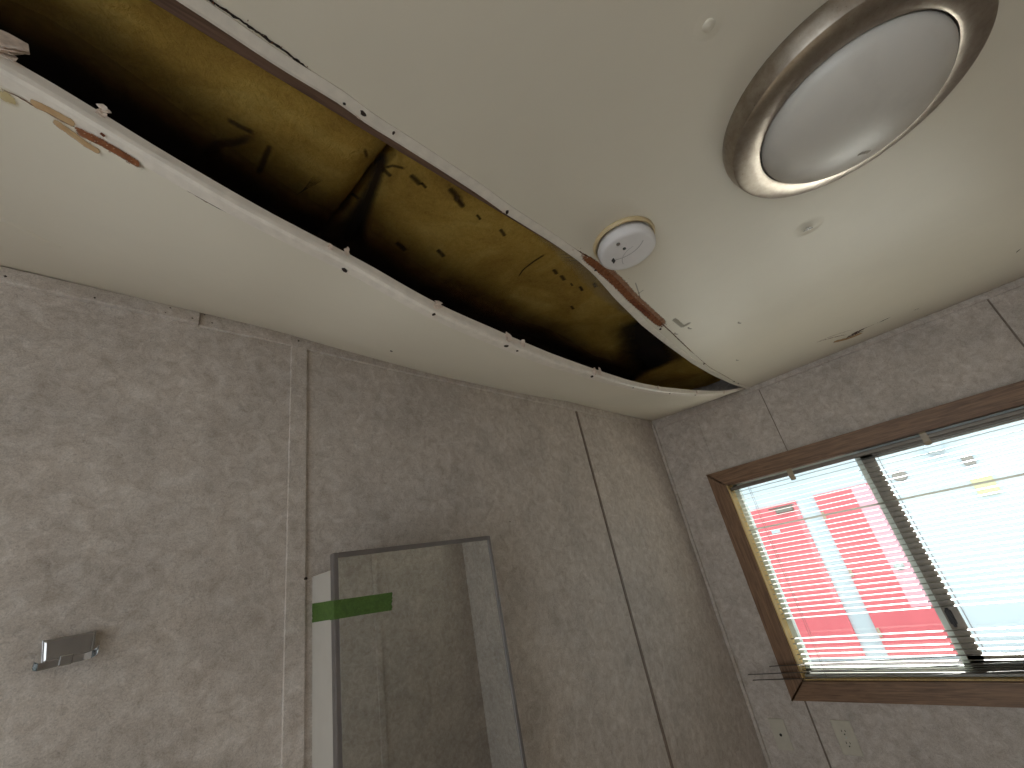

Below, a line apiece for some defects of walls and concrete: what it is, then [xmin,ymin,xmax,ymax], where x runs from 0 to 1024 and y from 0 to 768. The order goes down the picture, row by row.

peeling [2,89,140,167]
damp [0,0,680,381]